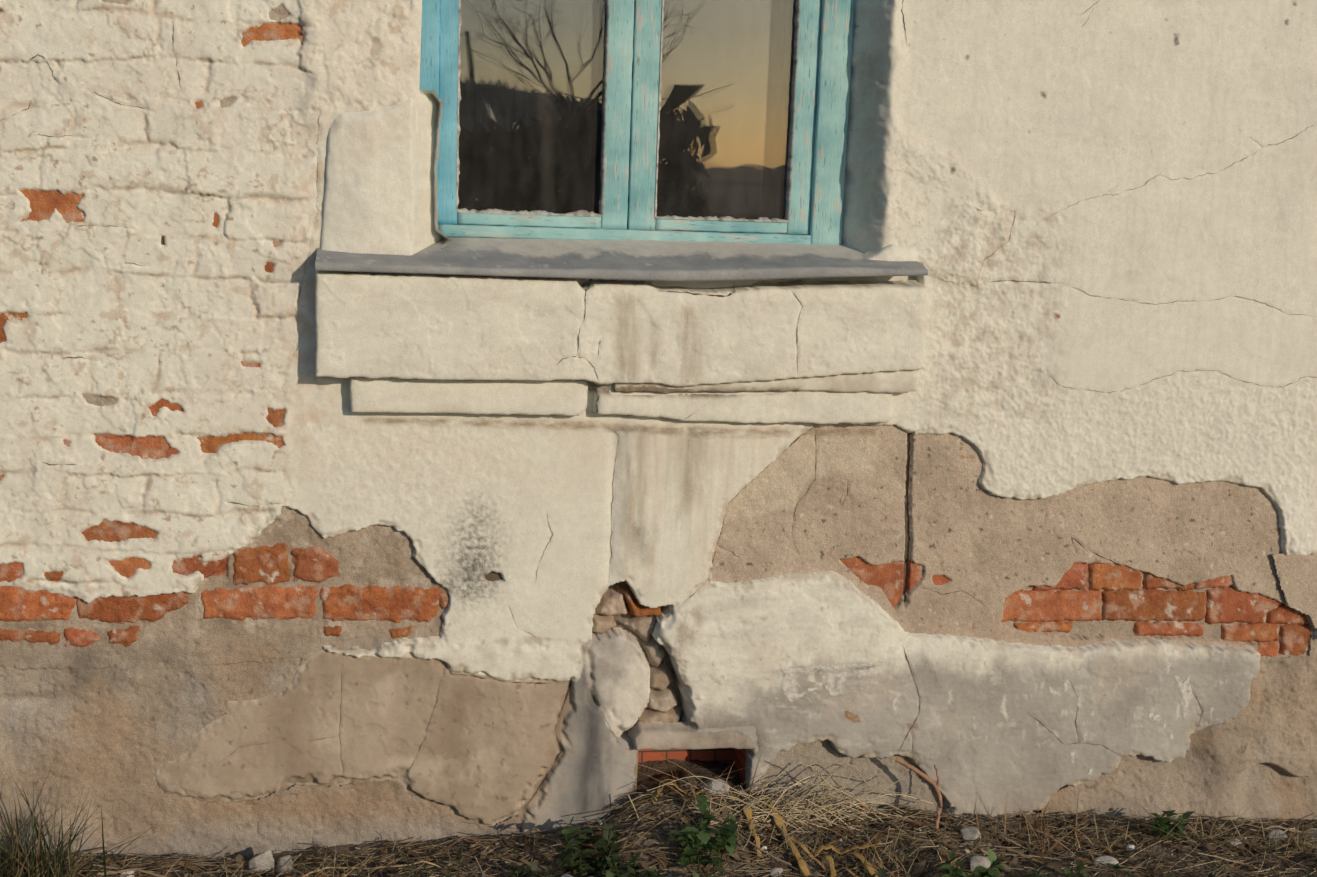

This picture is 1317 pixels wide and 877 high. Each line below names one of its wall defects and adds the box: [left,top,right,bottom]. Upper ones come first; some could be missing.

peeling [241,4,304,47]
peeling [19,189,85,223]
crack [929,125,1313,315]
peeling [0,312,28,343]
peeling [94,433,178,459]
peeling [148,399,184,416]
peeling [197,408,286,453]
crack [555,279,620,576]
crack [902,433,982,604]
flaking render [0,506,522,859]
flaking render [592,581,684,732]
flaking render [711,424,1317,822]